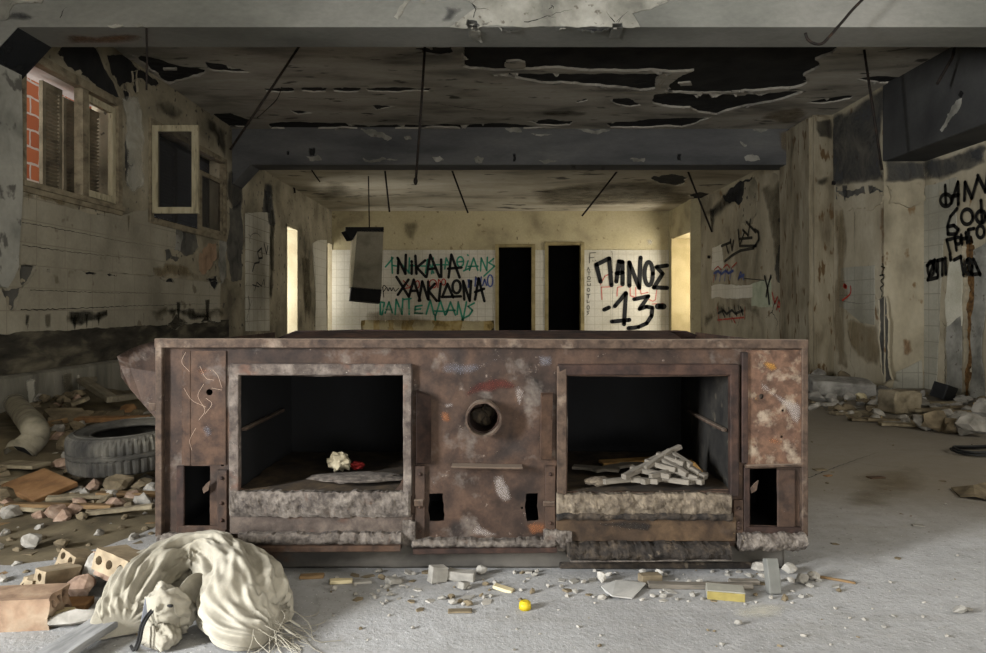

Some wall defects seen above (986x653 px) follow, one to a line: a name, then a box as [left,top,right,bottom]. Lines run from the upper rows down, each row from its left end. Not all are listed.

spalling [54,47,244,101]
spalling [269,0,836,141]
spalling [210,113,250,126]
spalling [722,175,753,205]
water stain [70,311,107,328]